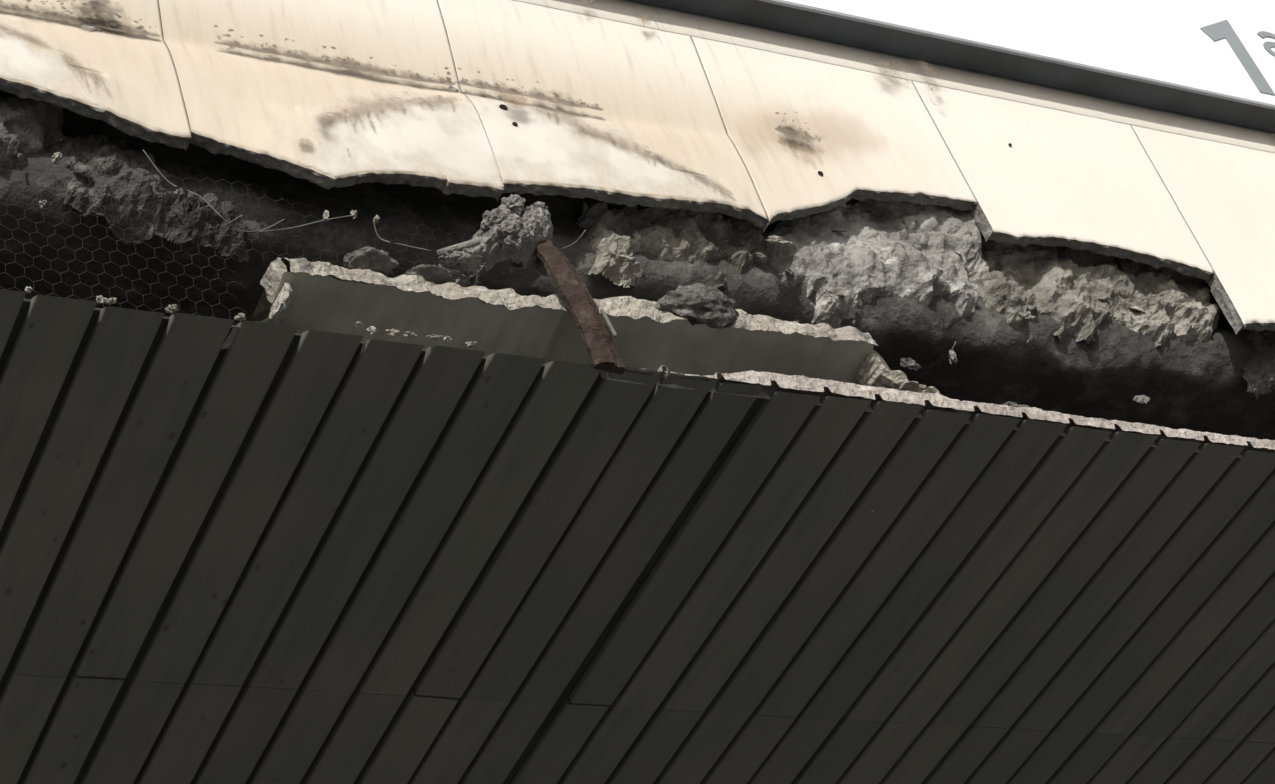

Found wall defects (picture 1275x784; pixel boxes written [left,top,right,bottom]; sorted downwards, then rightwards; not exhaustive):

leakage [0,0,160,37]
leakage [214,25,628,146]
leakage [775,112,820,142]
spalling [0,94,261,262]
spalling [576,198,1220,348]
flaking render [900,358,921,371]
spalling [1233,329,1275,399]
flaking render [1133,395,1150,405]